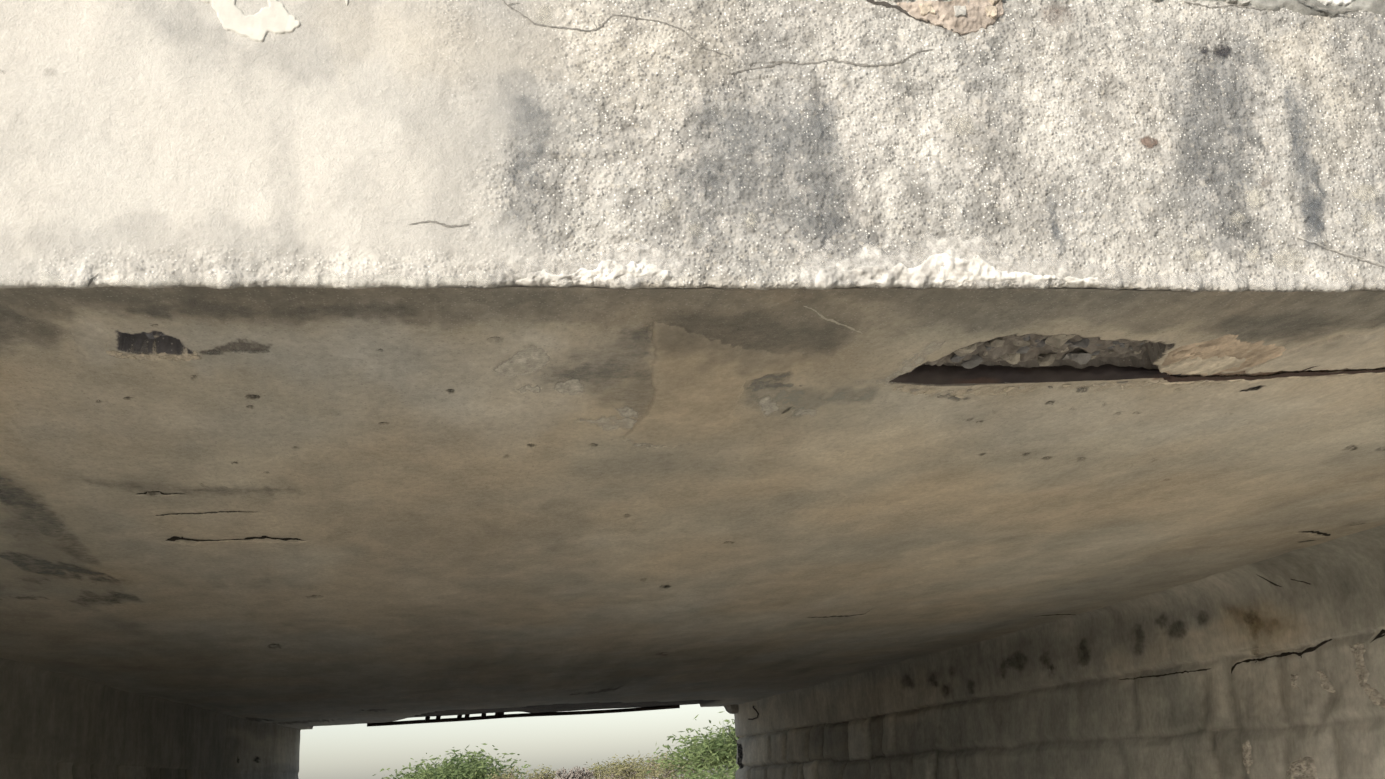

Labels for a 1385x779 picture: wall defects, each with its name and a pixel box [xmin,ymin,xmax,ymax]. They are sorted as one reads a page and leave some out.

peeling [202,0,301,42]
spalling [891,0,1004,36]
flaking render [1192,0,1385,17]
crack [503,0,967,88]
spalling [106,332,270,361]
spalling [889,334,1385,400]
crack [1143,365,1385,385]
crack [1368,627,1385,642]
crack [1119,637,1333,680]